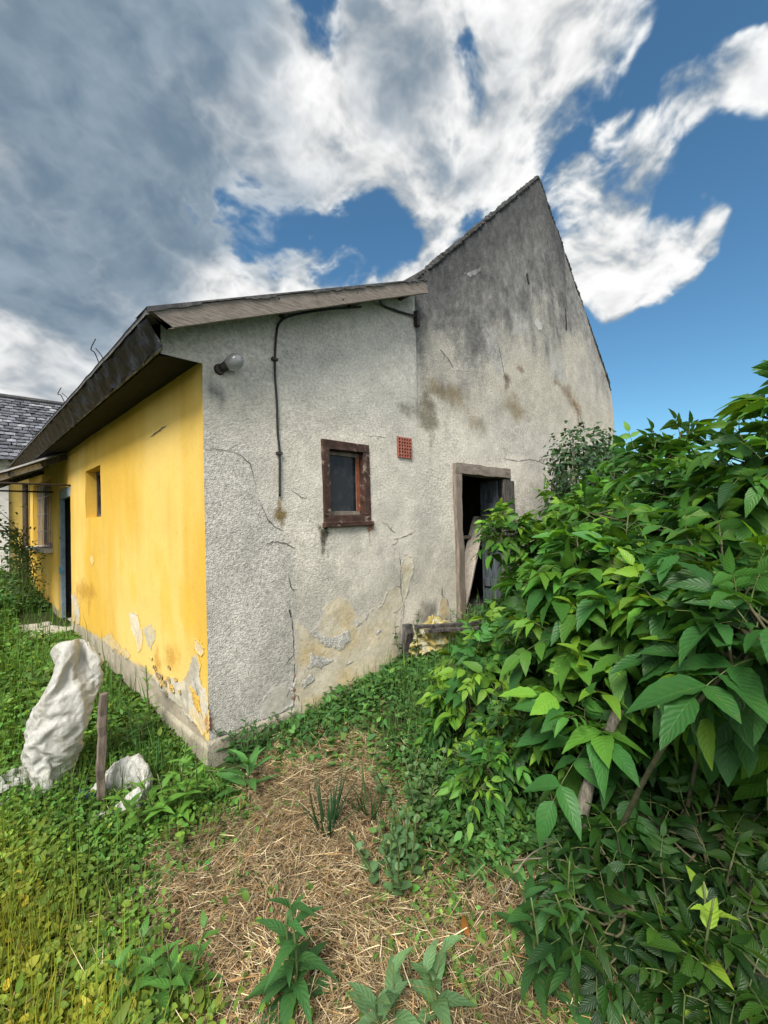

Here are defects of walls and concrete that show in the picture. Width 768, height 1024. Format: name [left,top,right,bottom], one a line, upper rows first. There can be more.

crack [204,445,296,549]
peeling [102,612,215,736]
crack [220,617,299,736]
peeling [258,553,414,721]